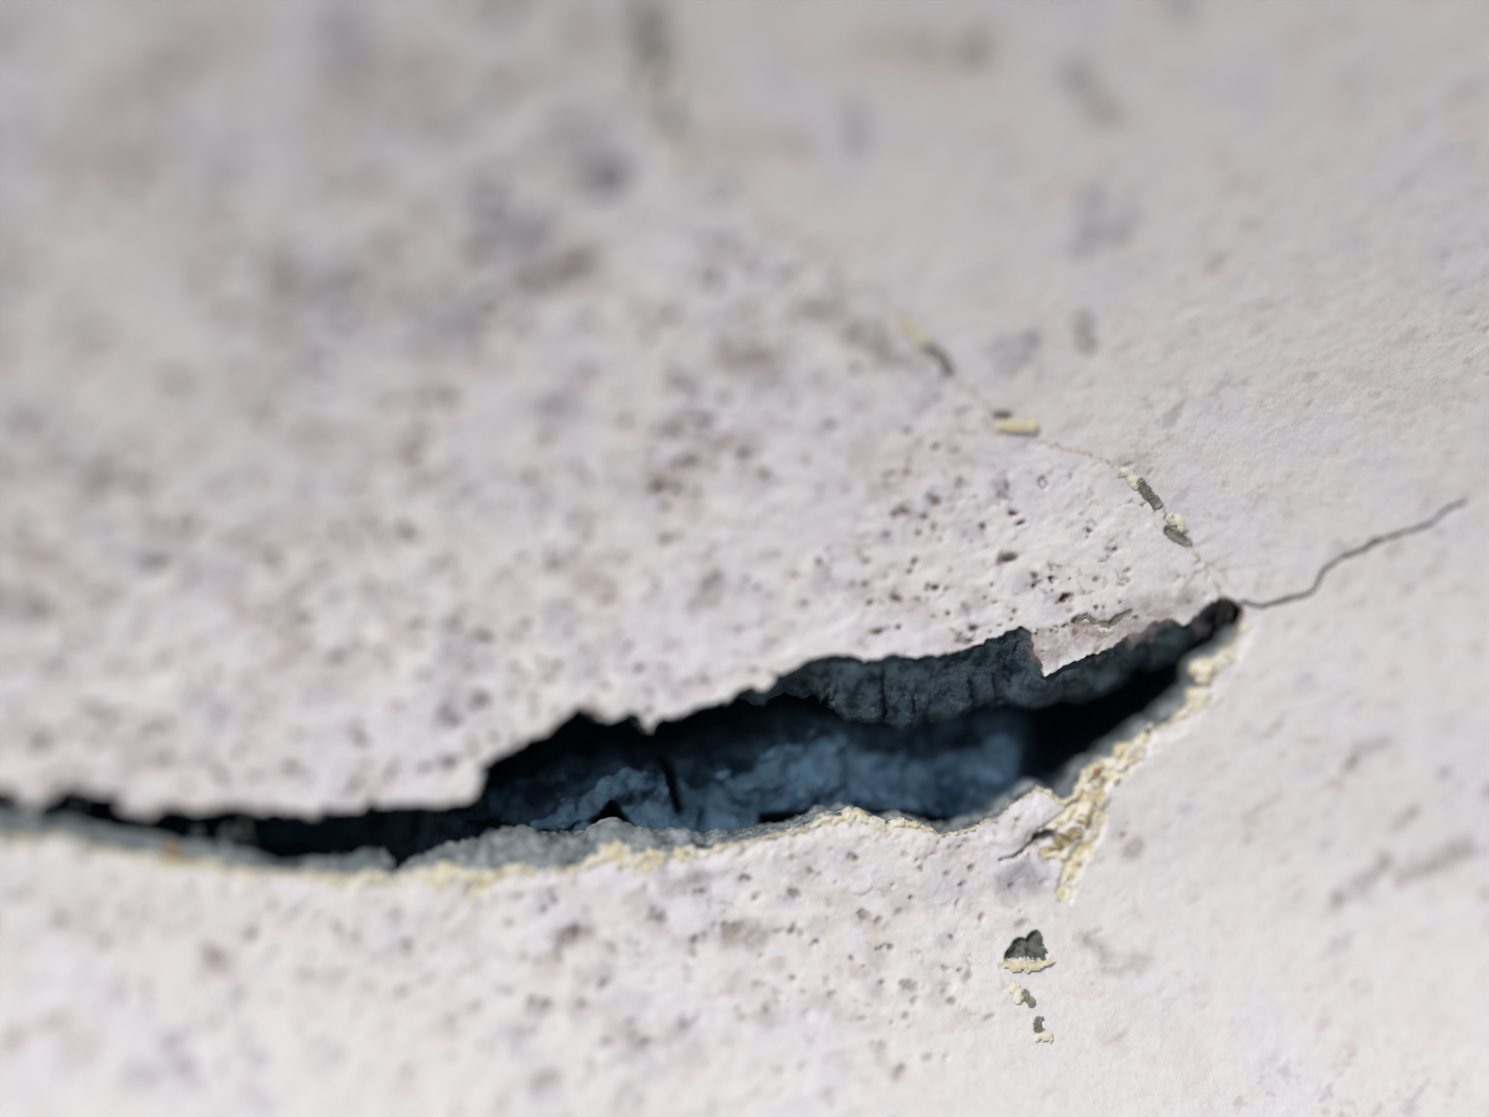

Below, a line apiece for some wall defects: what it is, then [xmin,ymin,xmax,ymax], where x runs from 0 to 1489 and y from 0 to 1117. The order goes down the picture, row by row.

peeling [1071,609,1133,635]
spalling [1022,722,1154,906]